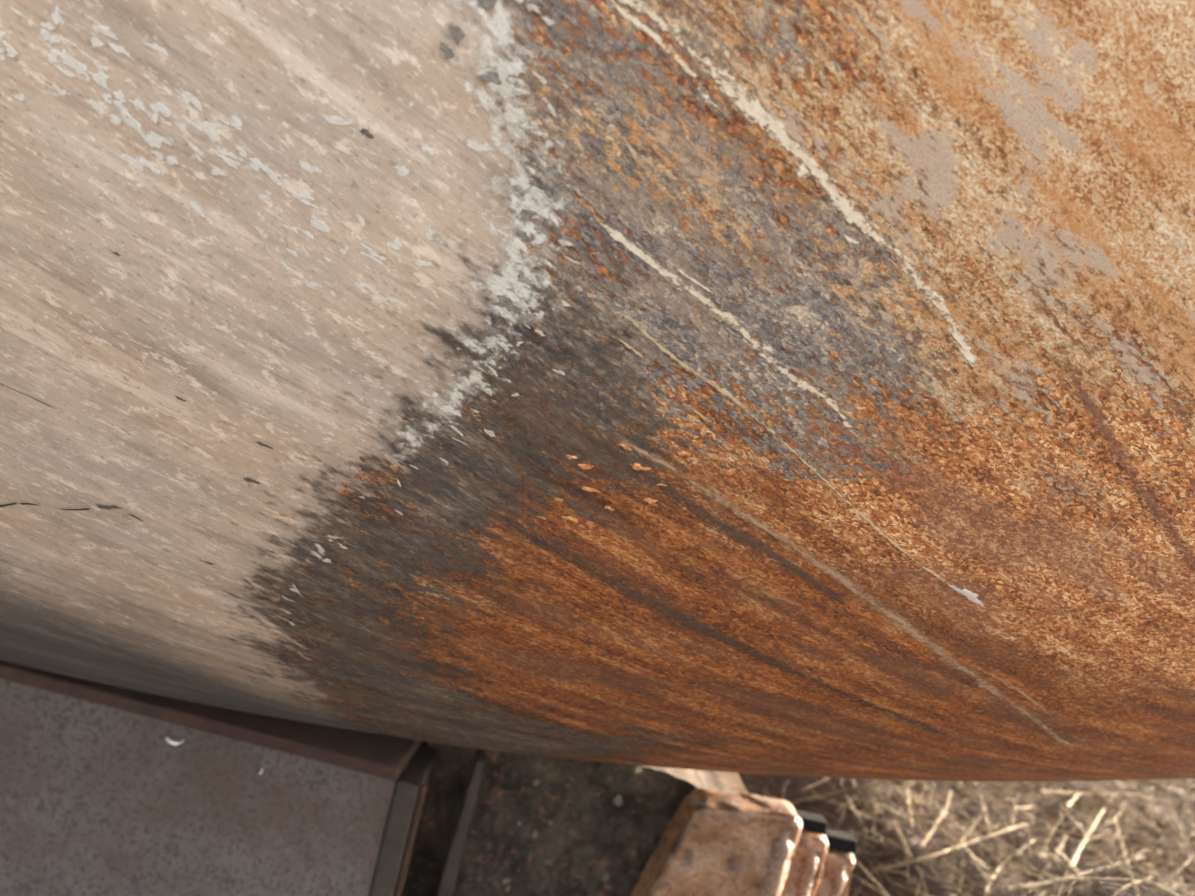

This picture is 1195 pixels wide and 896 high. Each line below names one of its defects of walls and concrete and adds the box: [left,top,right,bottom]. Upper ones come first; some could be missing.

peeling [0,30,19,61]
peeling [40,4,331,240]
peeling [322,114,374,139]
peeling [325,238,403,269]
corrosion [258,0,1195,782]
crack [0,503,90,511]
damp [229,282,943,764]